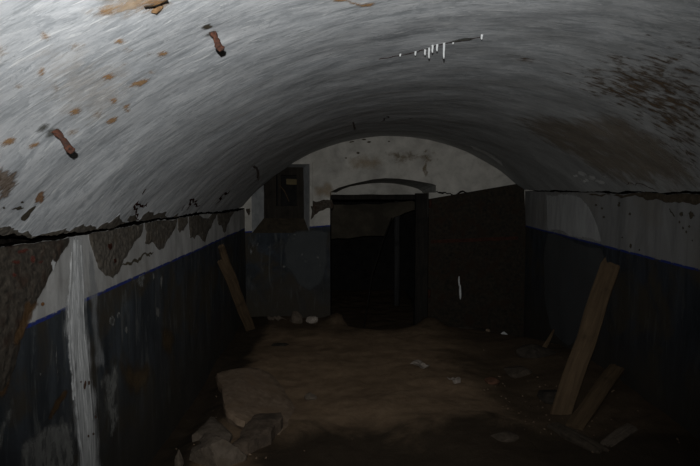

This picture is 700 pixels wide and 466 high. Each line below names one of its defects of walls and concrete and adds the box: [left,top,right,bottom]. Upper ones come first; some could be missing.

leakage [66,238,99,466]
flaking render [0,210,235,392]
crack [0,189,244,247]
crack [534,182,700,195]